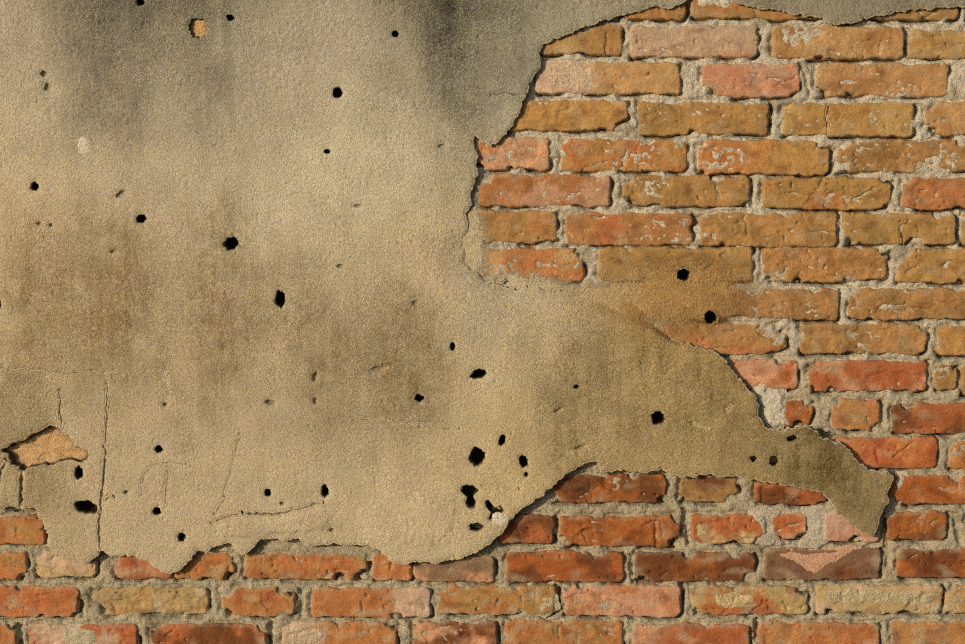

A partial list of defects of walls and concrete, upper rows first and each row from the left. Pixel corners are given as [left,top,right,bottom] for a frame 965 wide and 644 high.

spalling [39,70,51,92]
peeling [77,136,90,155]
spalling [464,0,965,293]
crack [56,390,64,430]
spalling [0,207,965,644]
crack [0,459,27,510]
crack [96,385,114,551]